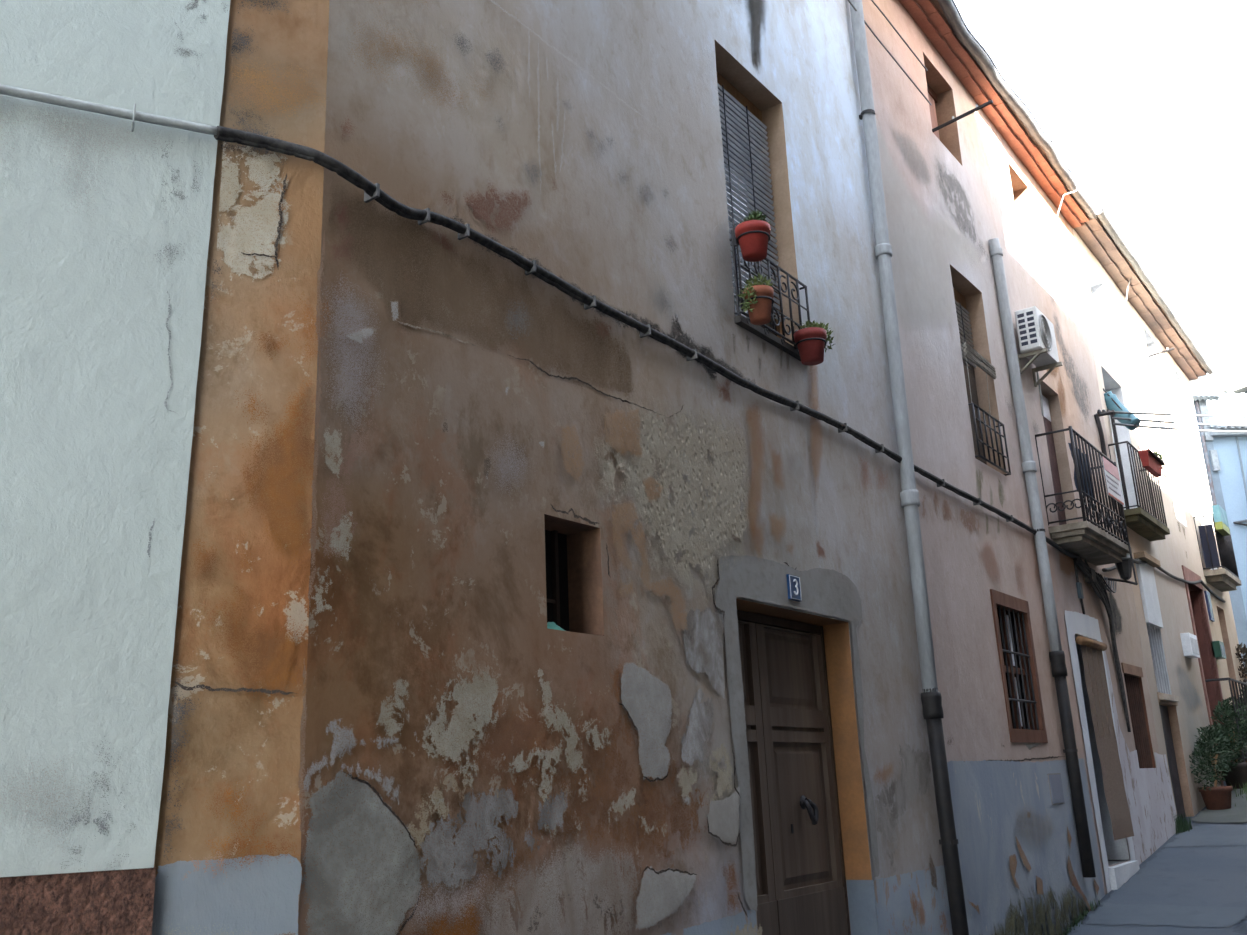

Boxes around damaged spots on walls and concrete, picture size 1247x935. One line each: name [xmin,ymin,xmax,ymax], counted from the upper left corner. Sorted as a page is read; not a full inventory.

water stain [735,0,767,74]
crack [241,174,287,268]
water stain [891,129,989,259]
crack [164,291,178,414]
crack [509,355,683,418]
crack [171,681,298,695]
peeling [376,678,410,737]
peeling [677,607,734,808]
peeling [408,665,612,889]
flaking render [601,788,668,837]